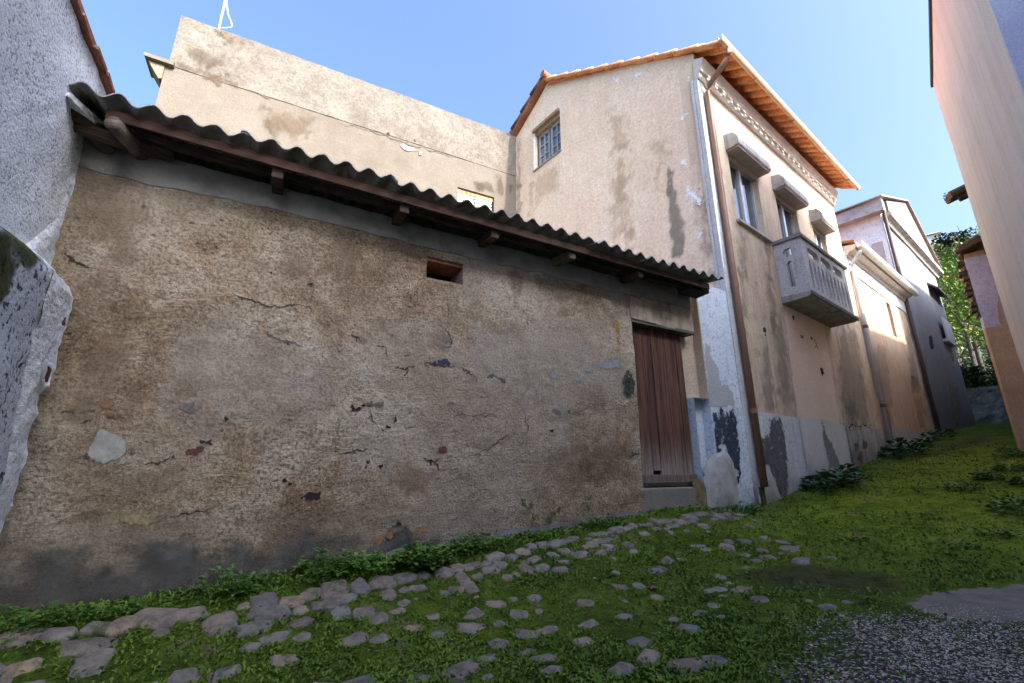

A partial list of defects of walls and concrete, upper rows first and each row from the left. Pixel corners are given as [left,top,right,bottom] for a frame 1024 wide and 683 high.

leakage [667,170,684,257]
peeling [684,185,703,206]
crack [231,295,312,316]
crack [352,303,501,382]
spalling [301,492,321,501]
crack [453,411,529,455]
peeling [705,343,741,484]
peeling [762,418,789,498]